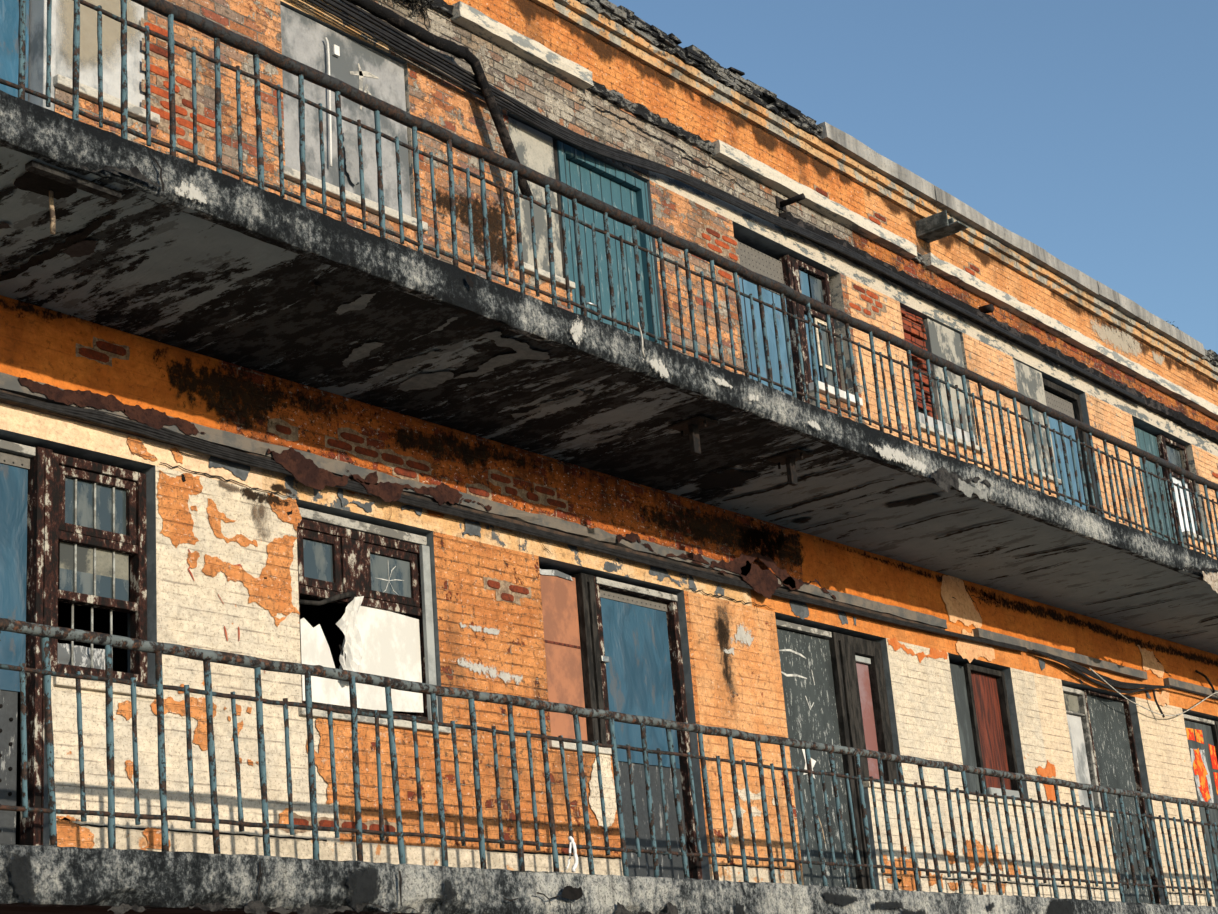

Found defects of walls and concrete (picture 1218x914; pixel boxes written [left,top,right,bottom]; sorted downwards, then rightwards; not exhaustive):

spalling [343,130,363,186]
peeling [124,404,206,435]
mould [153,347,552,471]
flaking render [325,427,568,516]
peeling [127,436,302,627]
damp [715,606,754,703]
peeling [887,575,995,663]
spalling [1202,571,1218,593]
peeling [279,718,406,837]
damp [7,850,39,905]
damp [345,864,381,909]
damp [440,877,458,912]